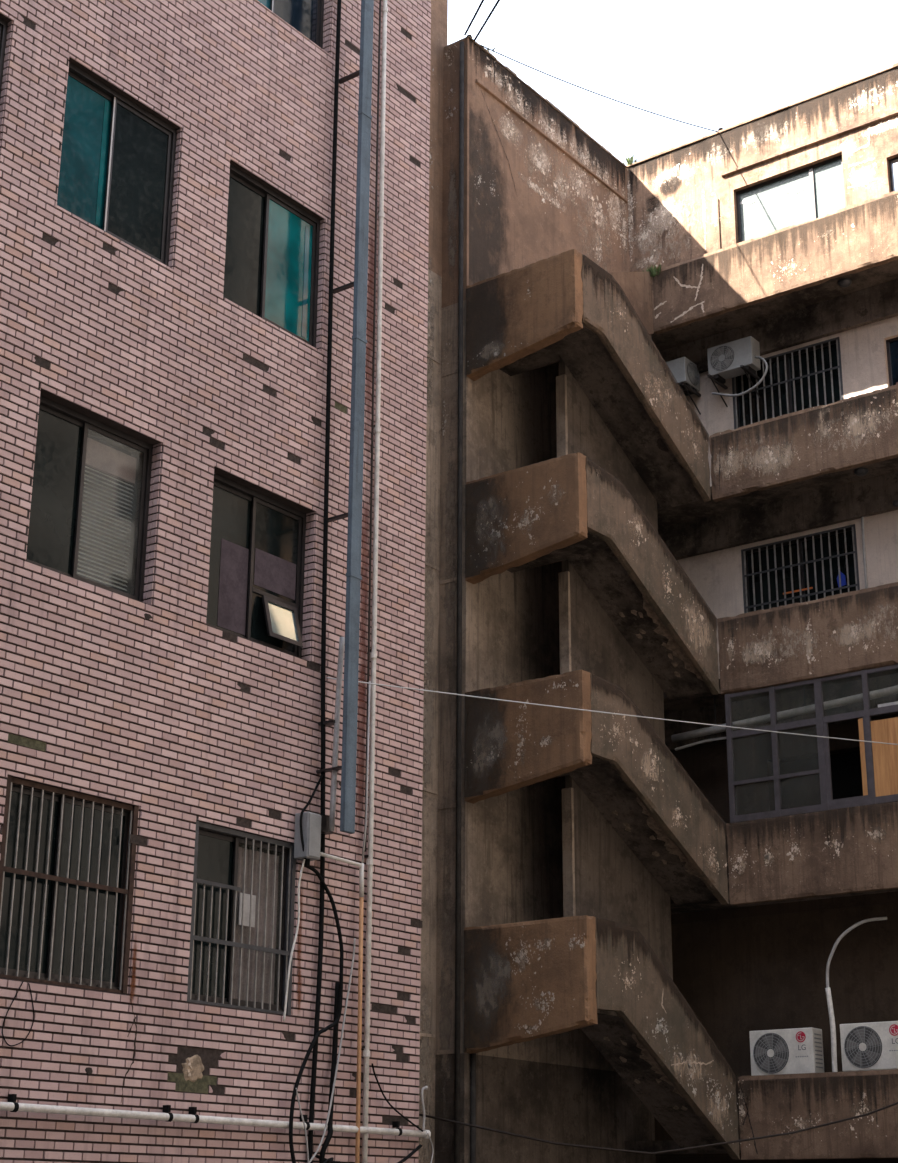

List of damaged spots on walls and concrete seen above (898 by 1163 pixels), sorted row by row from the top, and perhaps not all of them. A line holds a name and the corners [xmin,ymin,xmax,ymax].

water stain [469,39,898,212]
crack [654,264,705,322]
water stain [583,255,895,455]
water stain [656,193,898,290]
water stain [587,457,898,642]
peeling [8,733,46,751]
spalling [167,1046,226,1095]
water stain [596,917,898,1121]